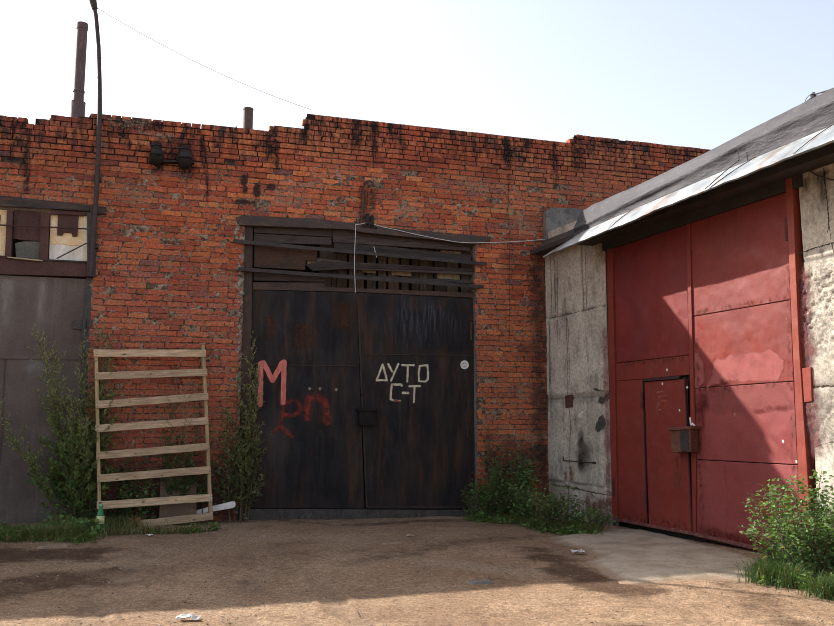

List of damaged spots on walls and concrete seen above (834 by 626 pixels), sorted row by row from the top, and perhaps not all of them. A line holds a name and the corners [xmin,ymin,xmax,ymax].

leakage [108,118,171,137]
crack [798,168,834,257]
peeling [686,349,788,416]